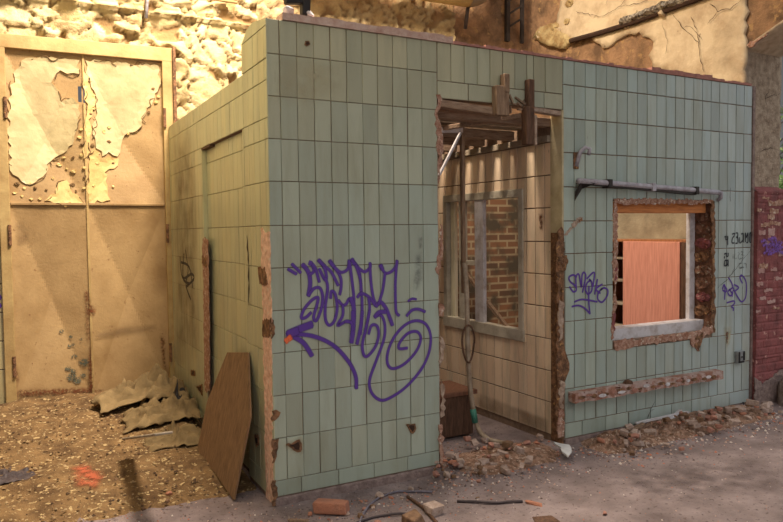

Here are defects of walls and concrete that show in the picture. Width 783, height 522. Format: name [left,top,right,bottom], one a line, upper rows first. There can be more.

flaking render [0,0,300,121]
flaking render [310,0,668,52]
peeling [592,0,769,82]
crack [662,0,741,71]
peeling [7,55,162,207]
spalling [258,227,281,506]
spalling [555,217,583,439]
peeling [579,375,720,399]
spalling [610,200,716,352]